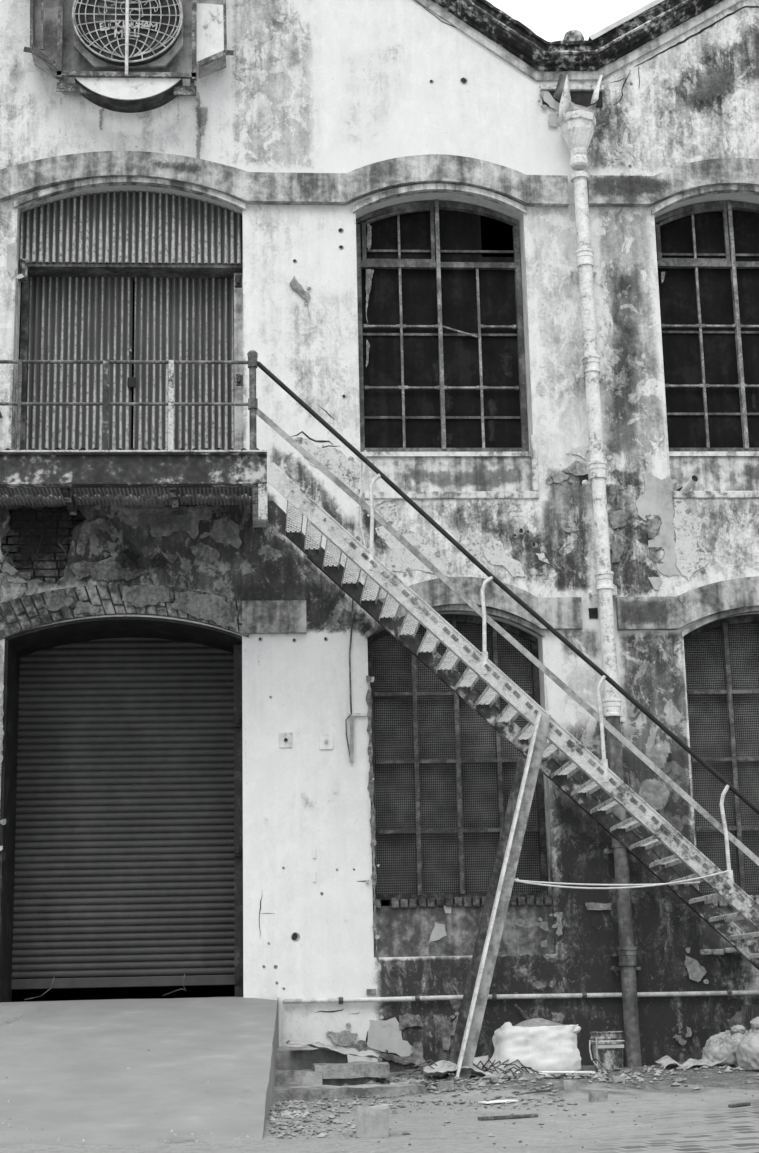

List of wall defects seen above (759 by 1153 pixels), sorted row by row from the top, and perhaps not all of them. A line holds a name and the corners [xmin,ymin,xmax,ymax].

crack [611,3,759,105]
damp [594,174,668,196]
damp [613,263,637,393]
flaking render [0,497,263,776]